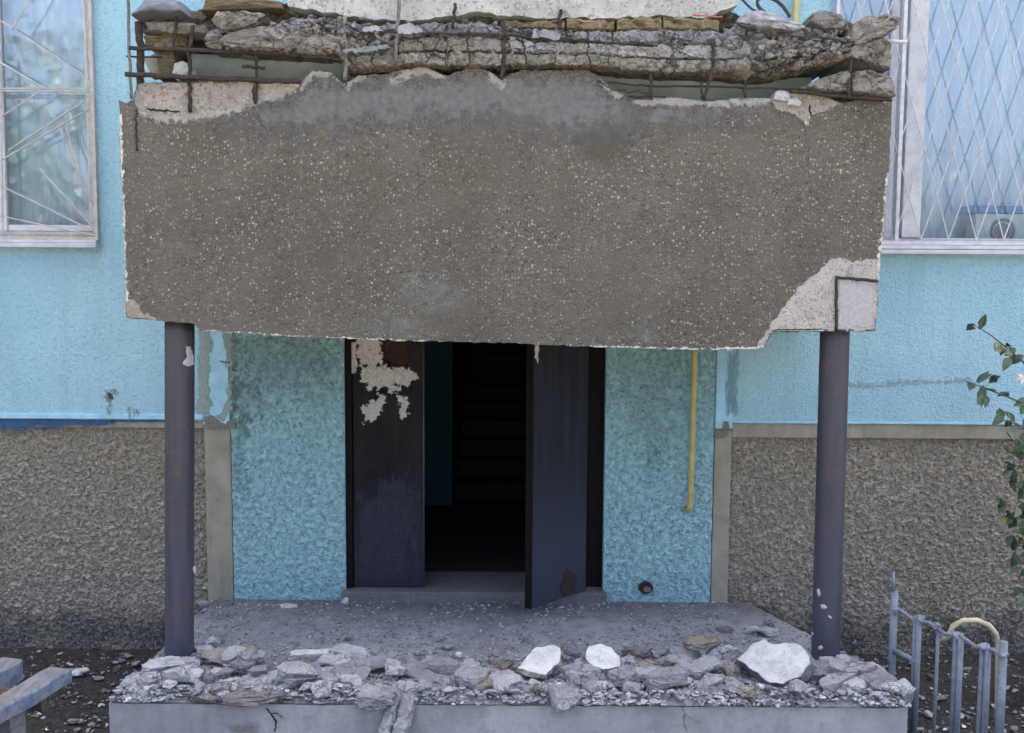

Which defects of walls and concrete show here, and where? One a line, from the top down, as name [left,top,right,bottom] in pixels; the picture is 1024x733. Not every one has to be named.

peeling [119,0,893,320]
spalling [590,217,884,350]
peeling [183,330,424,430]
crack [266,708,283,732]